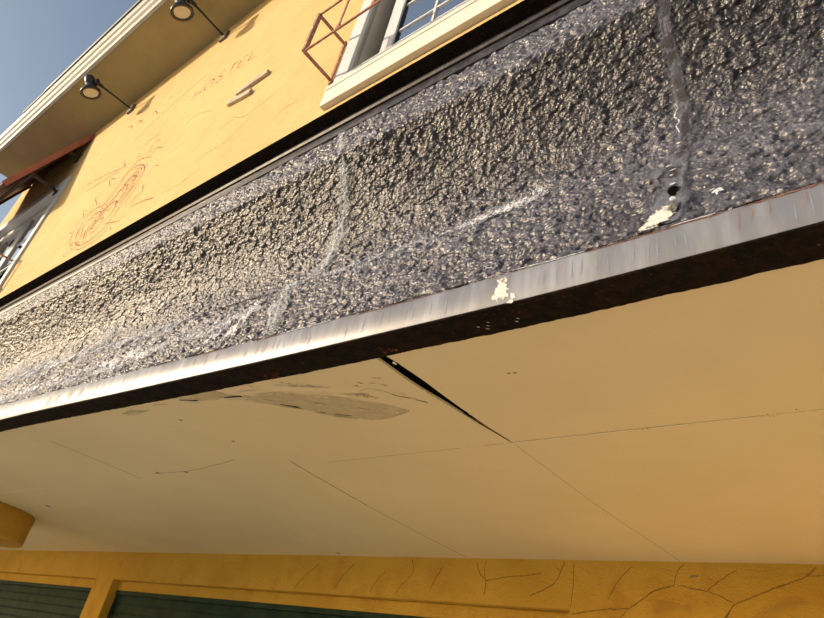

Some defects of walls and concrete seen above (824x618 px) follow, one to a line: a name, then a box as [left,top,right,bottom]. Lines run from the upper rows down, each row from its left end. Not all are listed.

crack [506,0,824,273]
spalling [639,182,689,232]
damp [0,164,548,414]
crack [252,282,471,341]
spalling [490,260,547,303]
crack [155,346,229,366]
peeling [178,385,409,420]
crack [357,356,719,495]
crack [477,562,824,618]